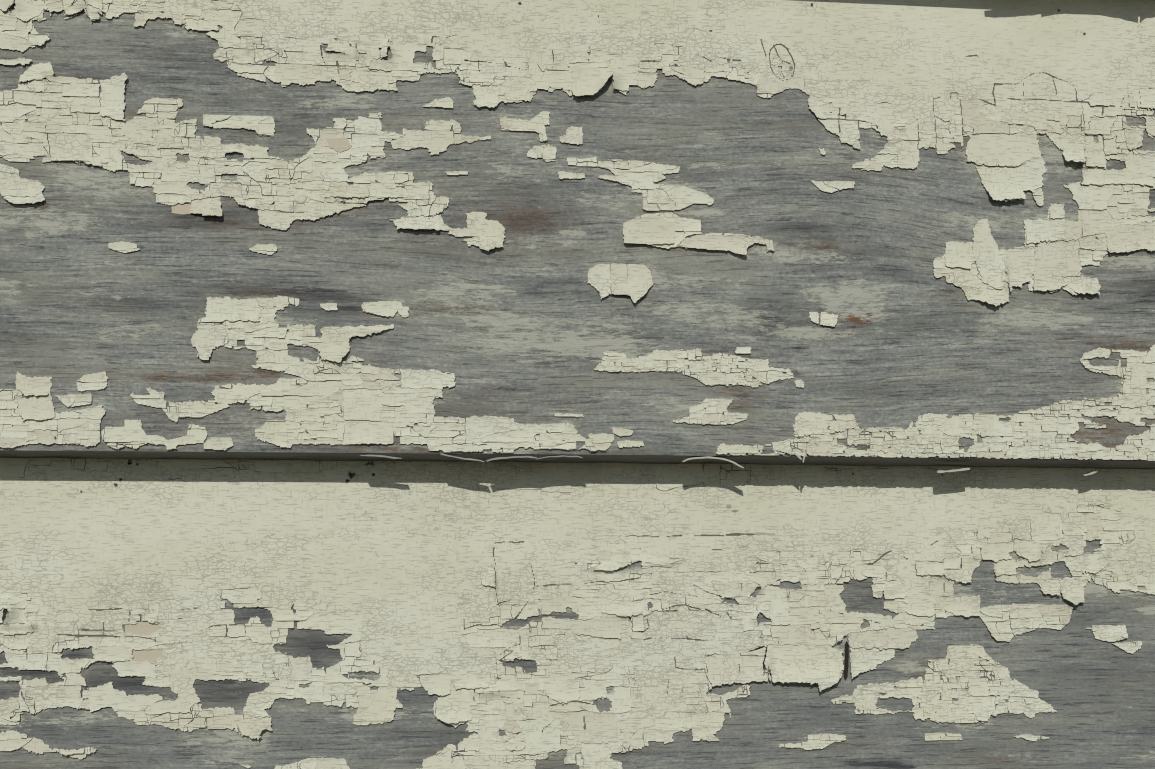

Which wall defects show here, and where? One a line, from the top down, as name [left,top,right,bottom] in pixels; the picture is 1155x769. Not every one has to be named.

peeling [0,0,1155,307]
peeling [0,295,1155,493]
peeling [0,504,1155,769]
crack [842,641,850,681]